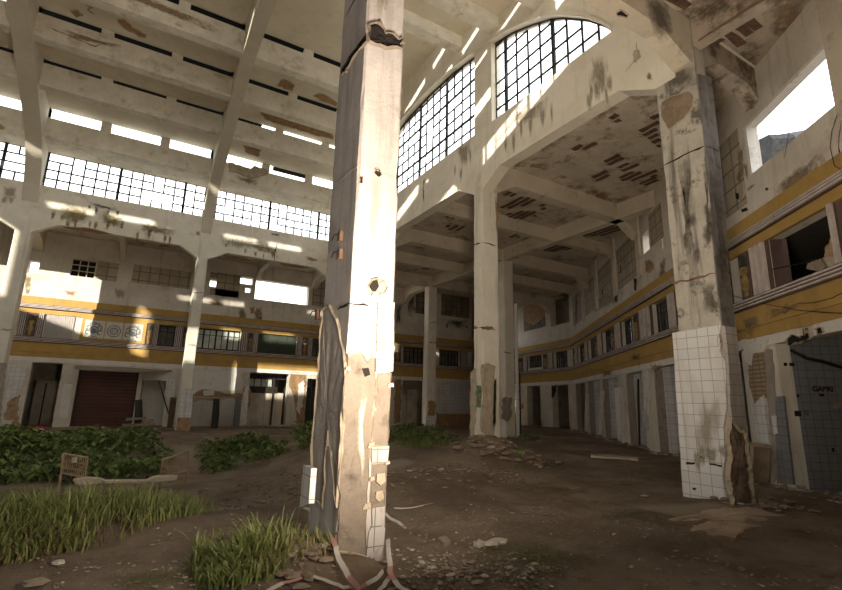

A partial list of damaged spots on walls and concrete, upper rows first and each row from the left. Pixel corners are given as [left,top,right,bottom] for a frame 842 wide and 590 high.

peeling [69,31,117,45]
spalling [117,18,147,38]
spalling [340,21,405,76]
spalling [662,0,692,11]
spalling [698,0,764,49]
spalling [638,105,663,149]
damp [682,183,699,261]
damp [704,183,731,278]
spalling [469,363,512,436]
spalling [288,304,394,557]
spalling [667,416,787,538]